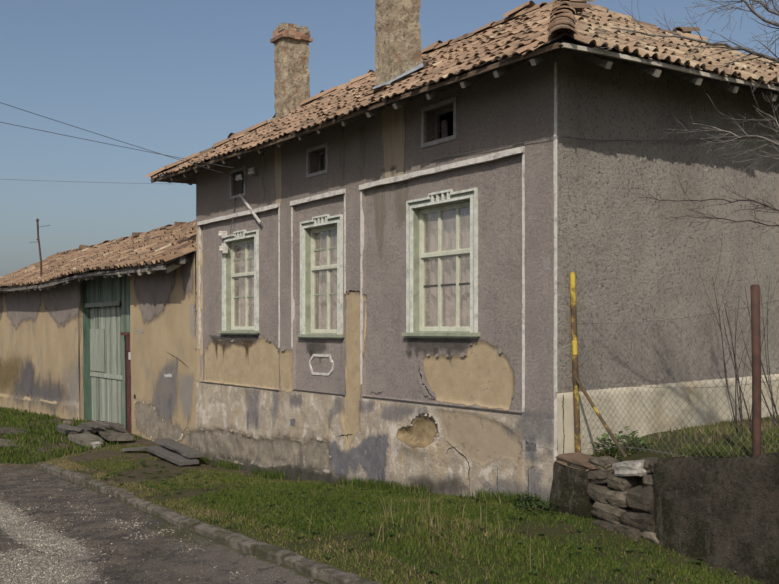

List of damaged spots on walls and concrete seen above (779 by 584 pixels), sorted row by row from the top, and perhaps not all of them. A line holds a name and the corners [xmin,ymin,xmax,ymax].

peeling [0,280,81,329]
peeling [134,227,293,393]
damp [0,361,78,410]
damp [155,363,192,419]
peeling [340,290,367,451]
peeling [417,341,514,411]
spalling [397,413,439,449]
damp [201,435,389,484]